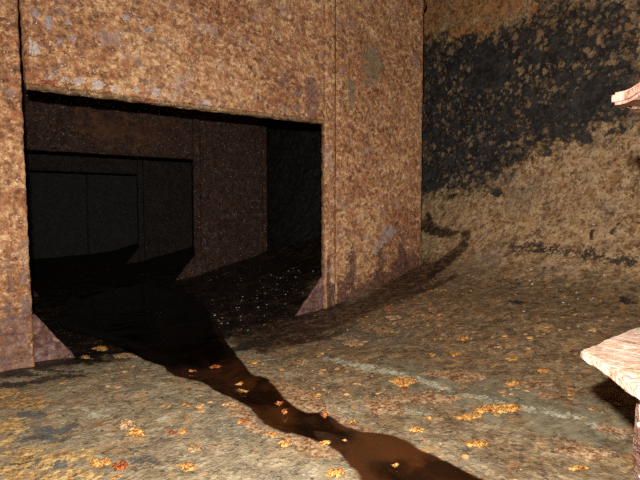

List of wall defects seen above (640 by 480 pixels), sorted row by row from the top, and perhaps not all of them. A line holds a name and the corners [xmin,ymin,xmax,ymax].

damp [230,212,471,362]
efflorescence [320,356,635,451]